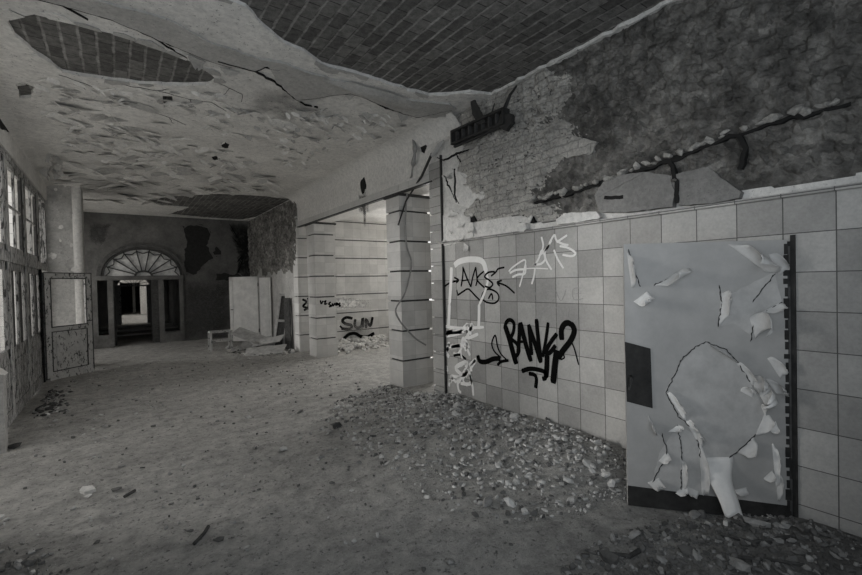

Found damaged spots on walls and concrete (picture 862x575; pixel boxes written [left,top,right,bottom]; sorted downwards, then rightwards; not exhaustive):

crack [38,0,447,125]
flaking render [0,0,862,281]
peeling [626,249,693,306]
peeling [648,244,792,526]